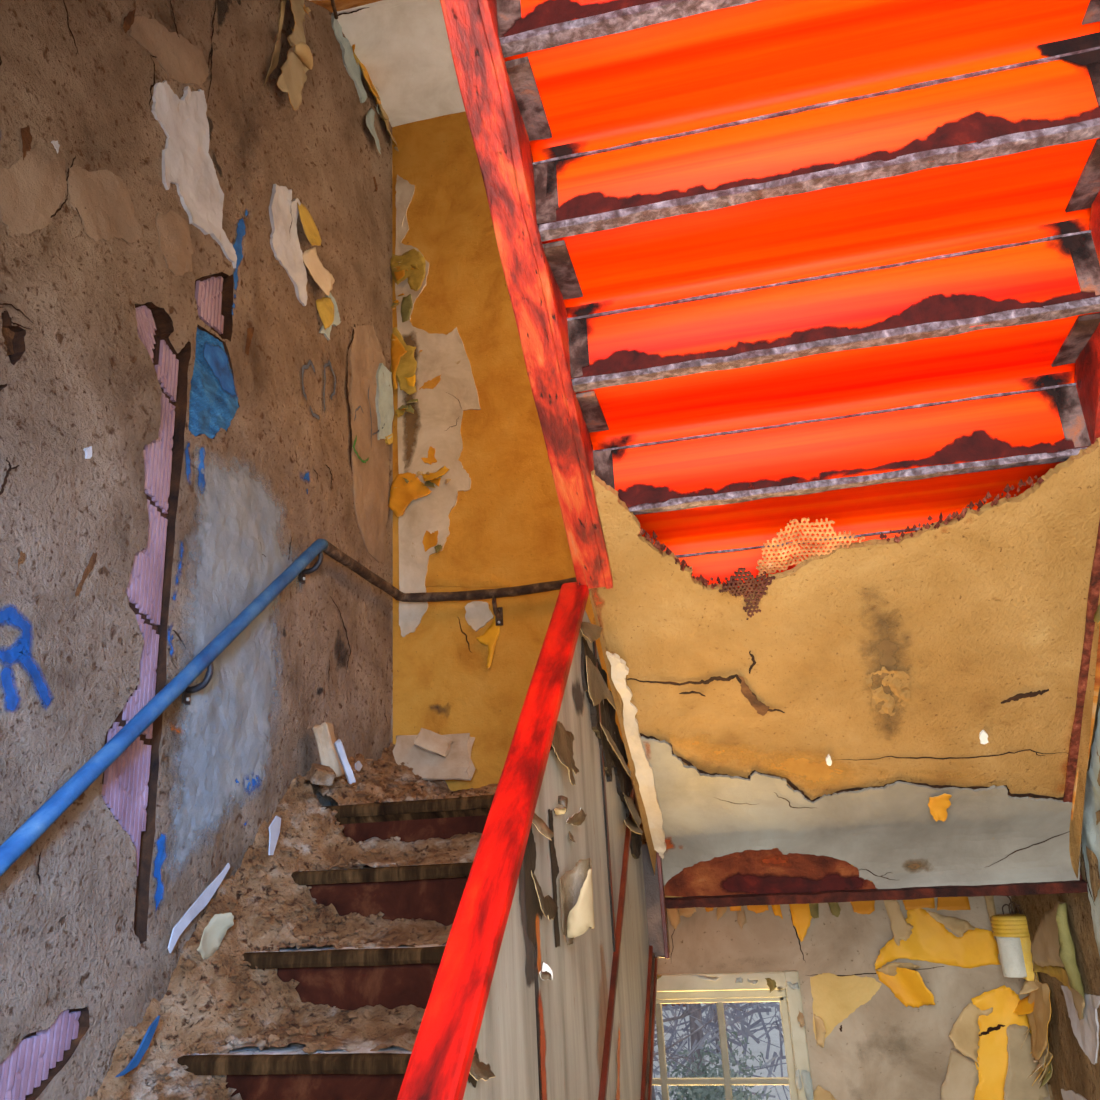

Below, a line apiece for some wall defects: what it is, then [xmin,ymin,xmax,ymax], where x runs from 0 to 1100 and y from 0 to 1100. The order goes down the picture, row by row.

peeling [151,80,237,268]
crack [0,458,20,495]
spalling [105,305,179,744]
spalling [188,275,239,439]
peeling [375,175,481,637]
spalling [102,723,153,933]
peeling [524,795,595,947]
crack [627,651,785,713]
peeling [580,622,1100,1048]
crack [840,749,1066,761]
spalling [0,1009,81,1100]
peeling [941,900,1100,1100]